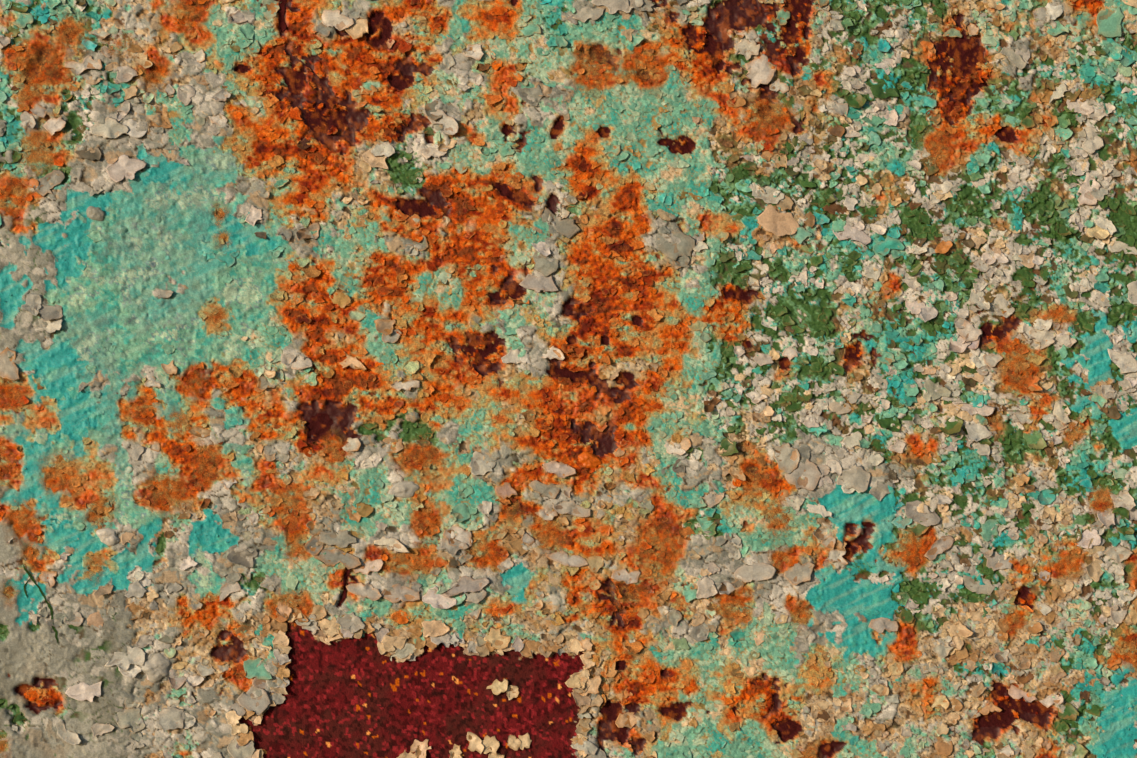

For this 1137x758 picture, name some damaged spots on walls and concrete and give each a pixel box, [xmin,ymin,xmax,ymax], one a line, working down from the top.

corrosion [0,2,98,112]
peeling [306,9,378,40]
corrosion [0,132,64,217]
corrosion [925,110,1043,175]
peeling [0,0,233,479]
peeling [198,205,292,267]
corrosion [119,0,709,741]
peeling [189,407,325,485]
peeling [342,421,382,466]
corrosion [42,450,115,524]
corrosion [720,454,801,527]
peeling [0,439,657,758]